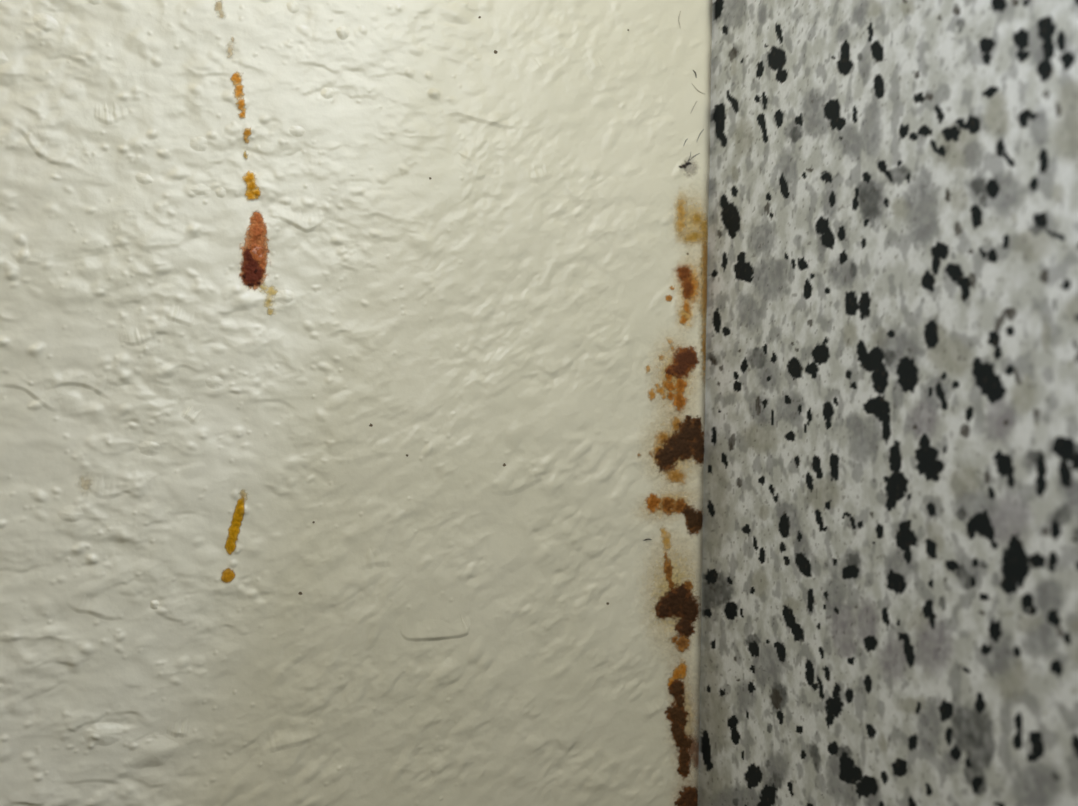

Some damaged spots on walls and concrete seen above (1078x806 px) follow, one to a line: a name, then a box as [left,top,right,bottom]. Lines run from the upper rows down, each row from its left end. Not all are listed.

corrosion [230,72,251,158]
corrosion [243,171,260,200]
corrosion [239,212,278,315]
corrosion [638,200,708,534]
corrosion [225,490,247,554]
corrosion [221,568,235,583]
corrosion [653,529,701,806]